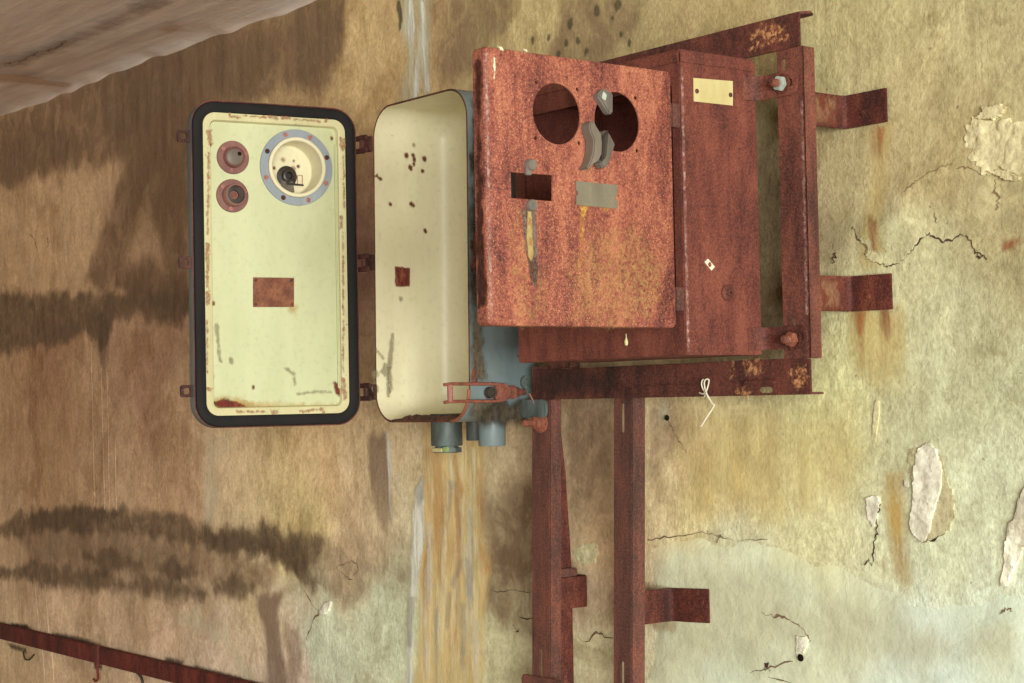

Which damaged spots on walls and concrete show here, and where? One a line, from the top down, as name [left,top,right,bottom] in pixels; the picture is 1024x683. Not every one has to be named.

leakage [0,0,343,353]
crack [852,164,1000,267]
spalling [964,103,1024,181]
rust [417,119,528,683]
leakage [0,477,424,683]
crack [647,532,766,543]
flaking render [866,496,881,539]
flaking render [904,443,956,543]
flaking render [1000,489,1024,586]
crack [751,613,811,683]